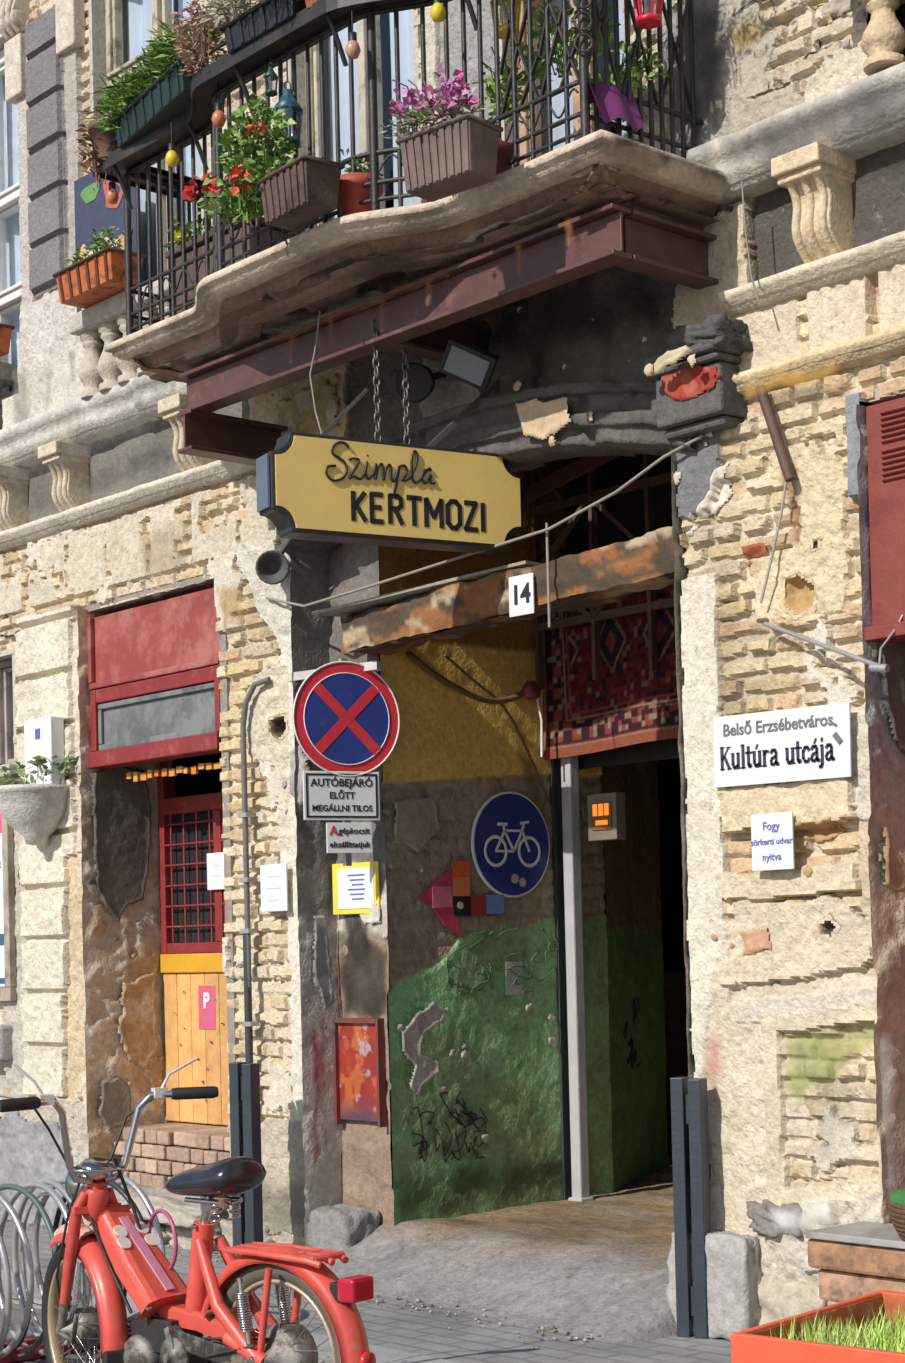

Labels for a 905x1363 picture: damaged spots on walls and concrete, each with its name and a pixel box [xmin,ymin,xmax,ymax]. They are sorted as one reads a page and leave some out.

crack [731,0,776,17]
crack [746,38,835,98]
peeling [644,345,722,401]
spalling [513,380,571,446]
peeling [686,462,734,536]
flaking render [741,543,769,566]
spalling [779,571,818,620]
spalling [267,712,289,743]